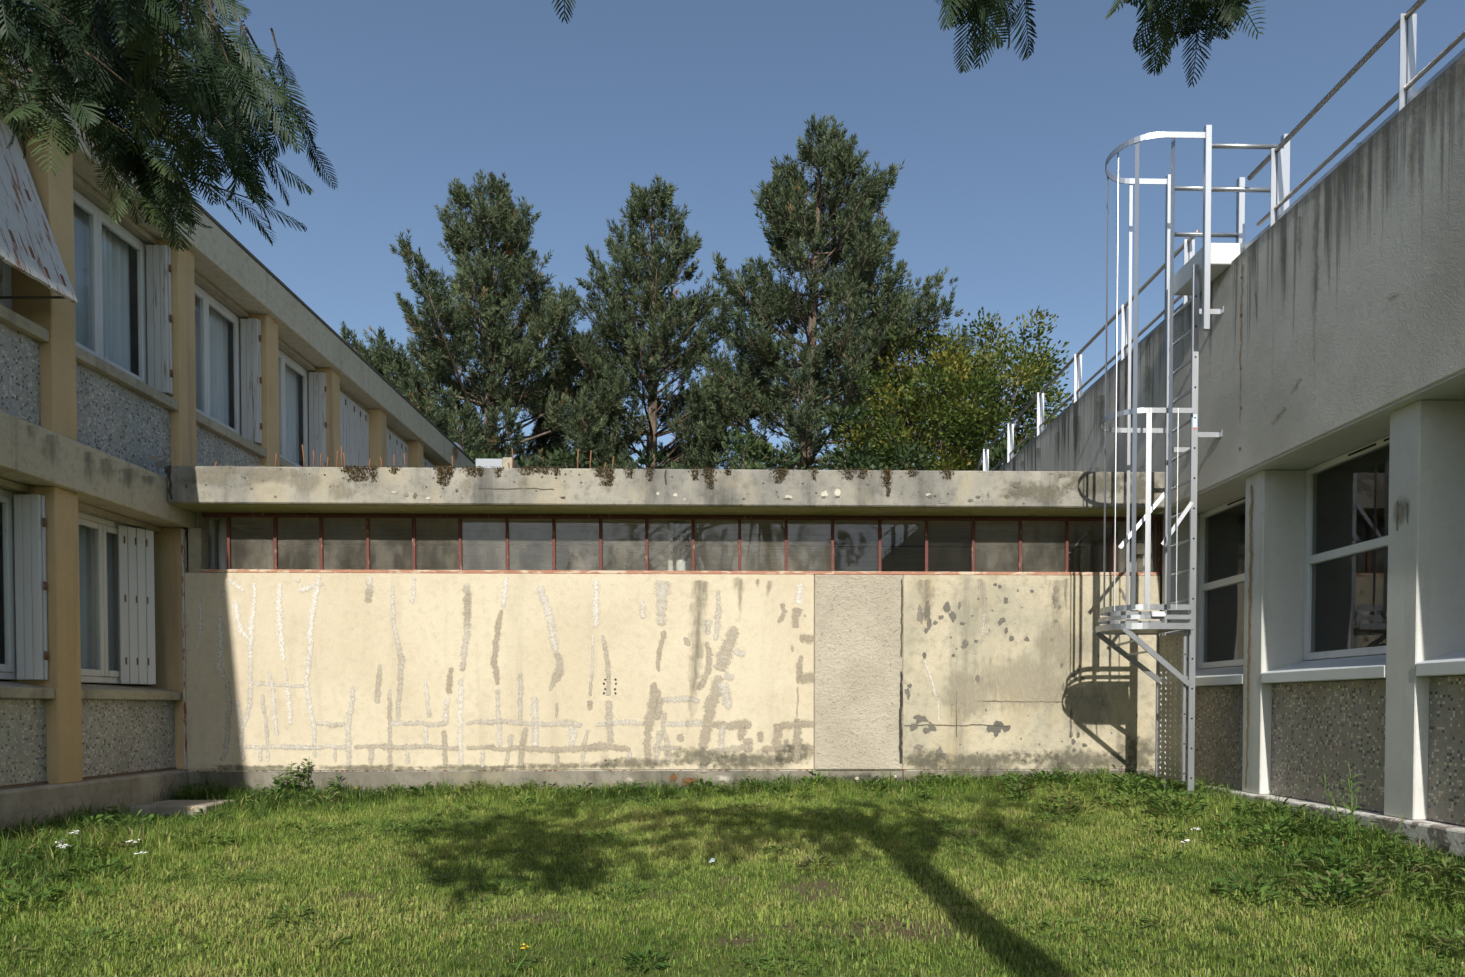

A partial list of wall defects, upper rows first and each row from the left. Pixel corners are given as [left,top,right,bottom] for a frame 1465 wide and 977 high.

flaking render [917,583,1034,657]
crack [899,579,1073,764]
flaking render [905,684,978,759]
leakage [907,737,1155,772]
flaking render [985,709,1088,754]